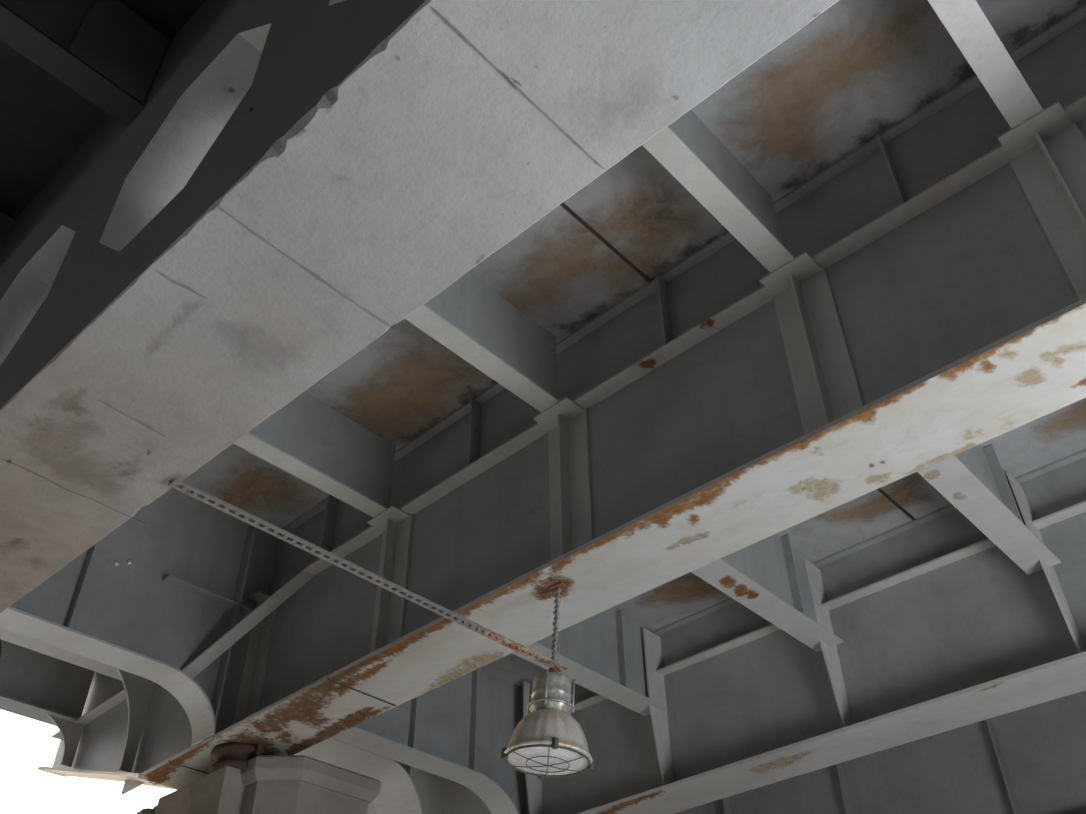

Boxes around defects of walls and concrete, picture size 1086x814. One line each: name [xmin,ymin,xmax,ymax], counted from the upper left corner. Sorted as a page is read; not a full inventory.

corrosion [940,305,1085,380]
corrosion [1044,402,1086,434]
corrosion [145,382,927,785]
corrosion [599,790,665,814]